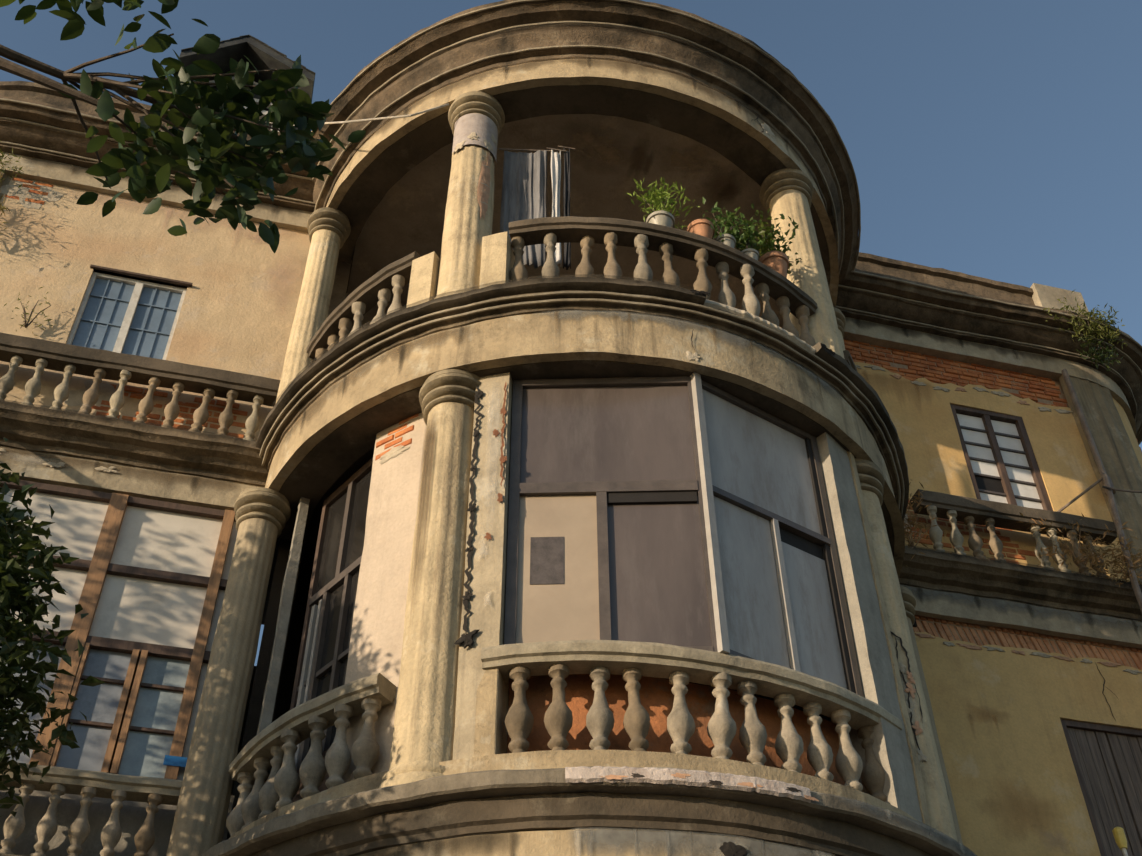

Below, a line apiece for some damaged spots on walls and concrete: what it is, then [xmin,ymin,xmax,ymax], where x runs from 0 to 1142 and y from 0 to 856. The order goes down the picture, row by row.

spalling [0,177,63,210]
peeling [452,113,498,220]
spalling [690,289,1073,414]
spalling [375,414,419,464]
spalling [913,615,1142,675]
crack [1096,664,1117,721]
spalling [565,766,819,803]
spalling [719,842,747,856]